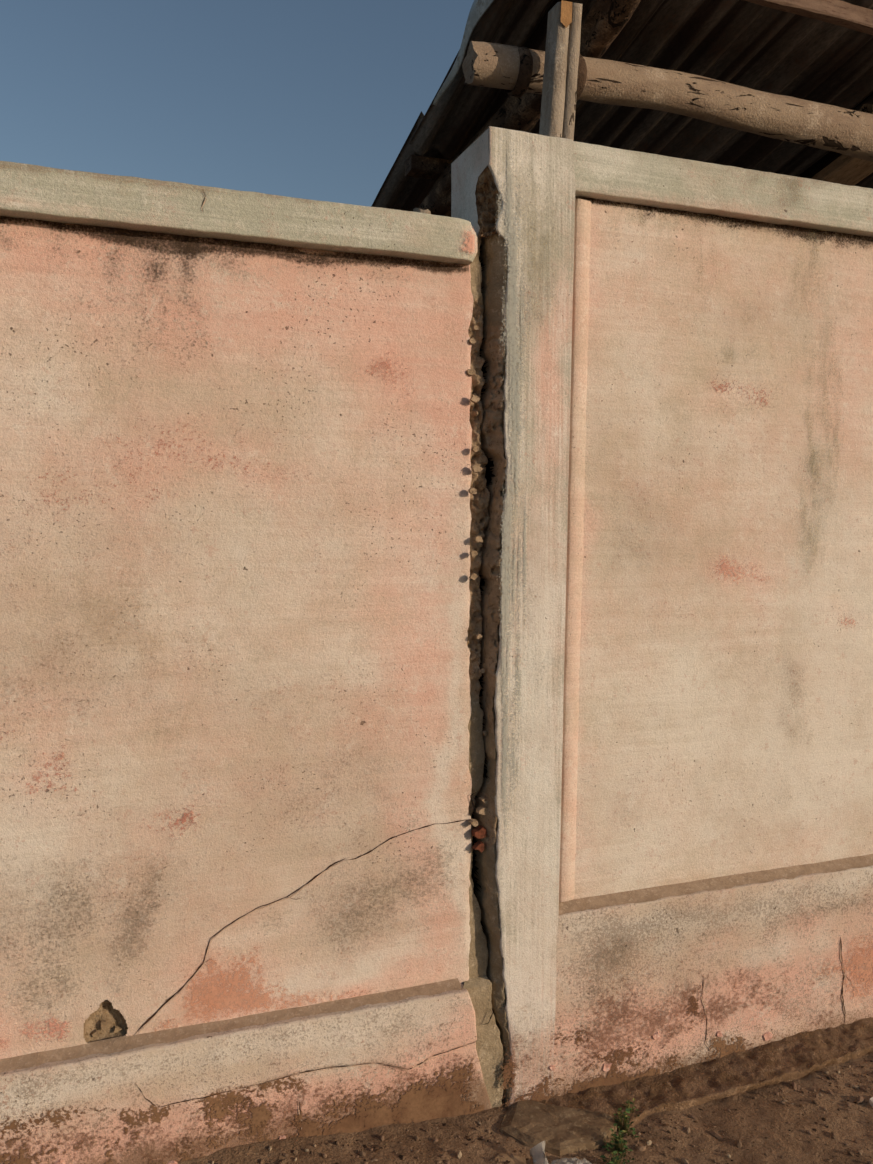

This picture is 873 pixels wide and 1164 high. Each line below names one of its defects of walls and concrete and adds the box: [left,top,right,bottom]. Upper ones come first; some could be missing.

damp [0,216,469,281]
crack [479,338,488,404]
crack [480,435,496,491]
crack [478,575,486,595]
crack [133,643,489,1036]
damp [504,969,787,1100]
damp [0,1055,471,1164]